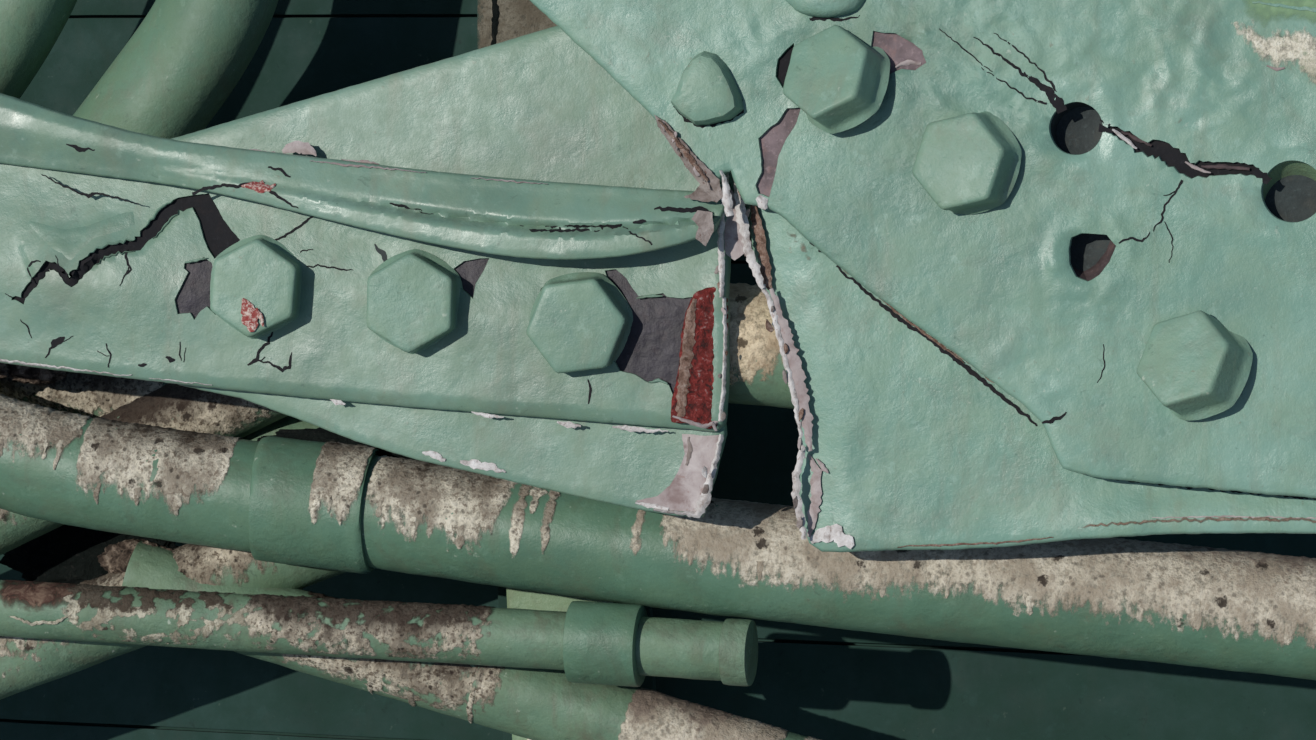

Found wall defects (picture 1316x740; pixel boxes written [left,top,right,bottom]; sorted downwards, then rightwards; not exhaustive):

crack [939,28,1067,114]
peeling [1234,22,1316,84]
crack [5,166,387,372]
peeling [606,270,692,393]
corrosion [671,287,729,429]
peeling [654,108,800,385]
crack [809,242,1067,426]
crack [1098,119,1272,263]
peeling [0,359,276,516]
peeling [612,412,1316,649]
corrosion [0,580,77,626]
peeling [618,688,788,740]